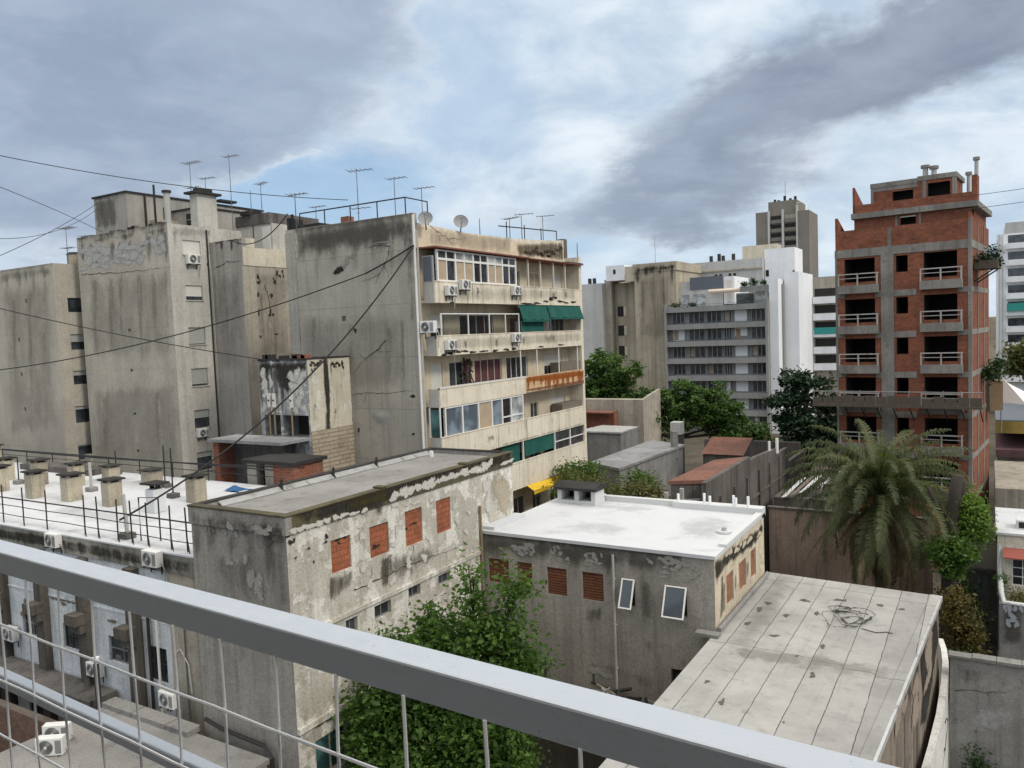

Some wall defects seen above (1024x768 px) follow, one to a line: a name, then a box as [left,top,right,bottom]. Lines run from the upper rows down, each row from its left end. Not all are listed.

damp [296,215,409,250]
damp [518,244,563,259]
peeling [260,367,274,414]
peeling [286,360,344,415]
crack [314,340,408,418]
peeling [389,458,514,516]
damp [0,530,45,545]
damp [62,541,140,563]
peeling [405,532,444,570]
peeling [583,552,603,566]
peeling [725,531,761,564]
peeling [1003,603,1024,628]